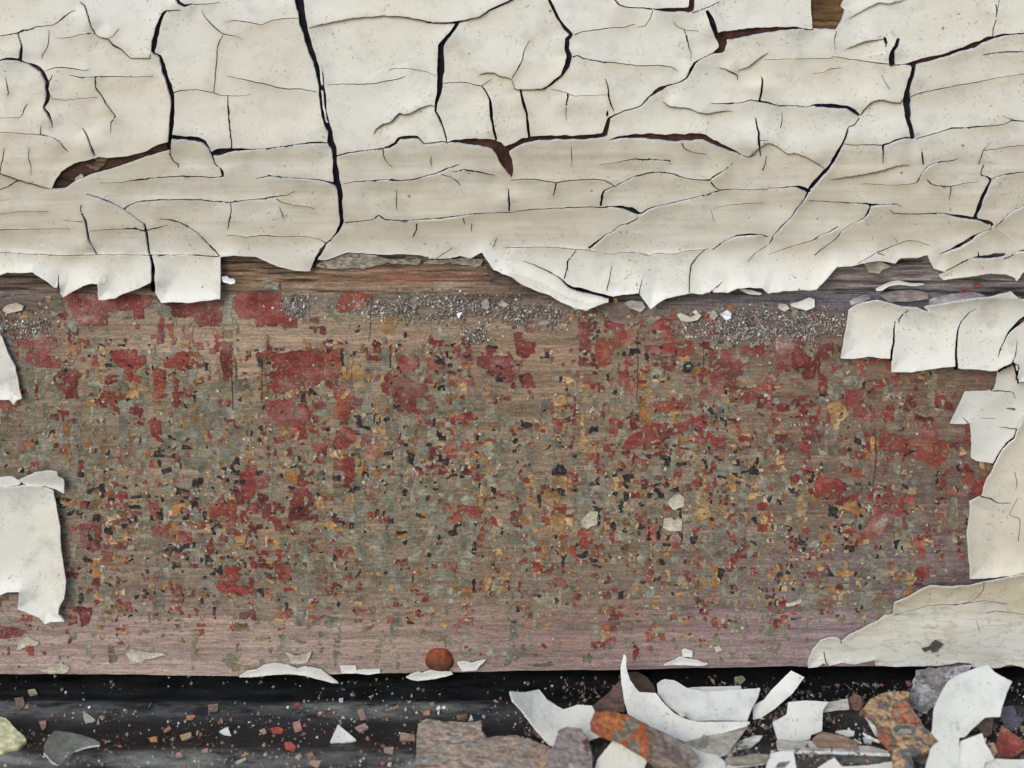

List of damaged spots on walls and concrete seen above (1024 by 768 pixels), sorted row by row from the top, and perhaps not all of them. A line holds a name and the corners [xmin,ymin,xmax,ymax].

crack [0,0,1024,301]
peeling [0,261,1024,768]
crack [889,311,907,361]
crack [896,588,1024,632]
crack [954,309,975,370]
crack [962,316,1024,541]